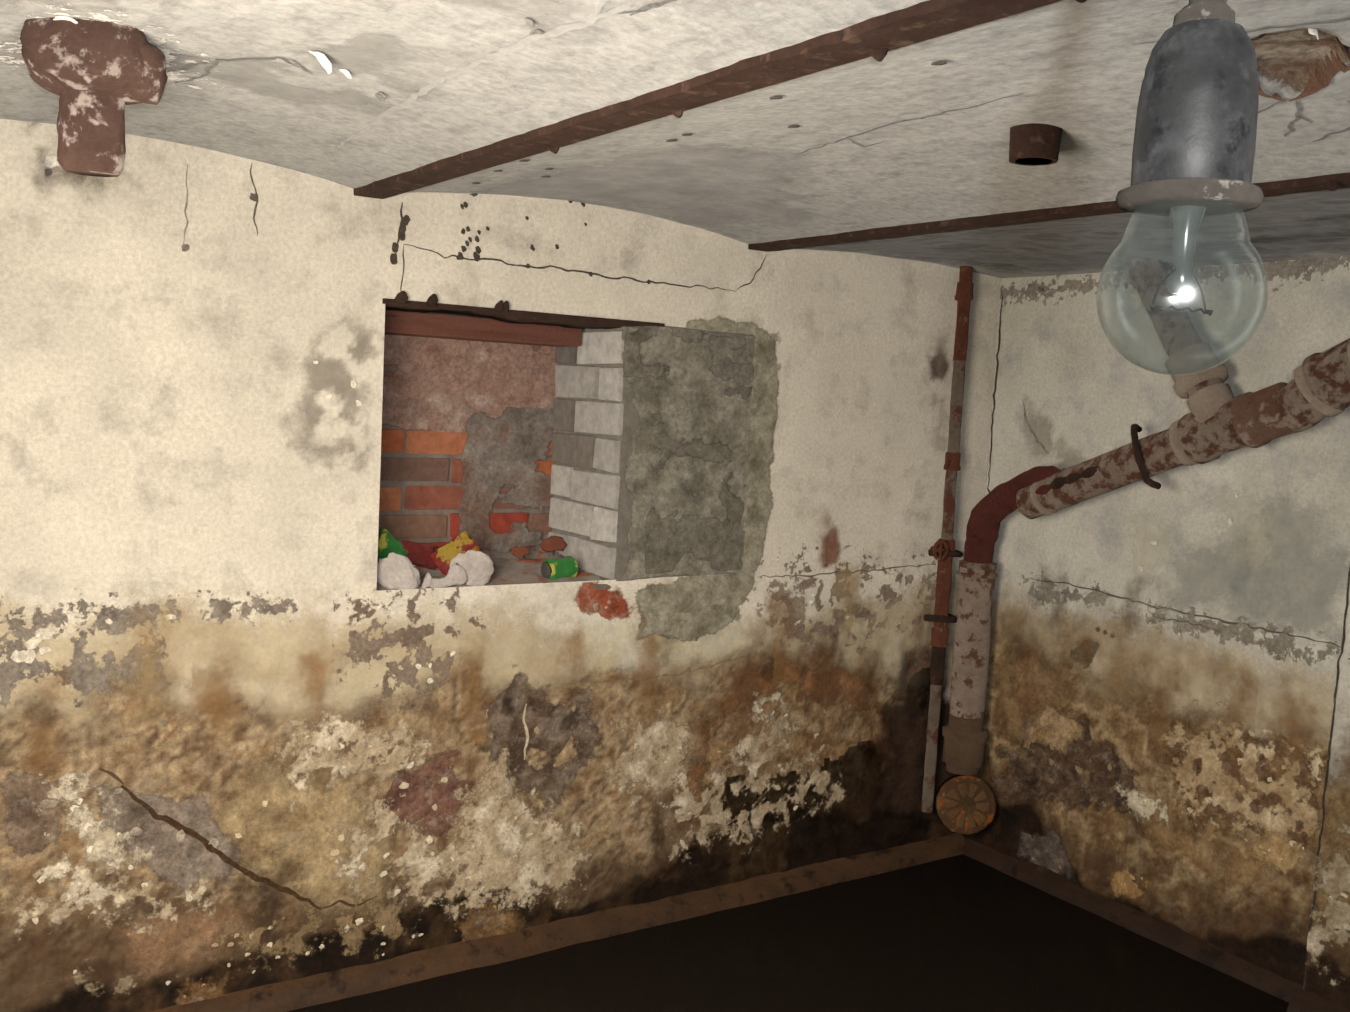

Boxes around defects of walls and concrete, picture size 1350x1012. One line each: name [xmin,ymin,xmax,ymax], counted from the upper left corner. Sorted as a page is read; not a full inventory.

spalling [1251,29,1350,101]
crack [390,202,767,292]
peeling [0,588,188,726]
peeling [194,588,298,626]
peeling [332,587,487,714]
spalling [574,582,632,620]
peeling [1019,571,1129,669]
peeling [1142,599,1341,666]
crack [99,767,377,910]
damp [0,577,1350,1012]
crack [1030,566,1350,990]